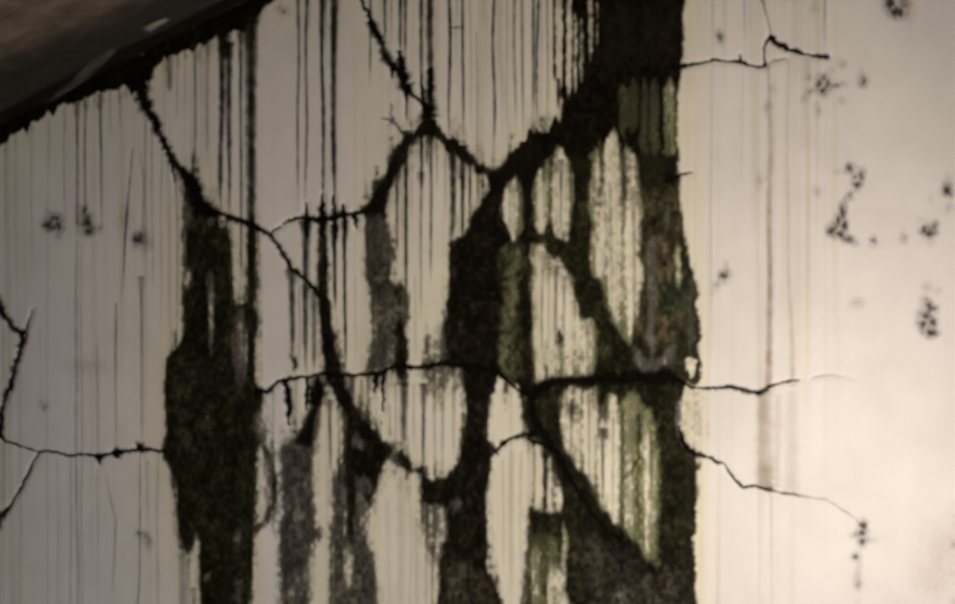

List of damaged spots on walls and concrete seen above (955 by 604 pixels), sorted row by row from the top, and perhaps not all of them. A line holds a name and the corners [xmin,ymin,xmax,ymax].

crack [360,0,437,135]
crack [665,1,830,71]
leakage [886,0,906,17]
crack [127,70,365,300]
crack [665,172,692,182]
leakage [828,207,852,241]
leakage [0,0,702,604]
leakage [921,303,936,336]
crack [0,300,167,527]
crack [254,360,804,545]